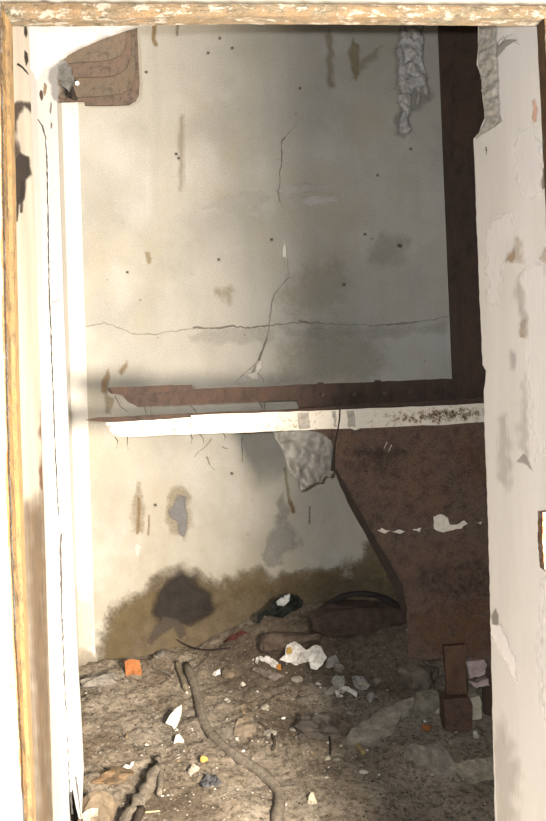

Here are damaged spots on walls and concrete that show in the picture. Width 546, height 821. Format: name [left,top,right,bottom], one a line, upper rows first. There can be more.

spalling [475,25,501,138]
crack [278,128,293,206]
crack [86,266,447,383]
leakage [78,498,398,666]